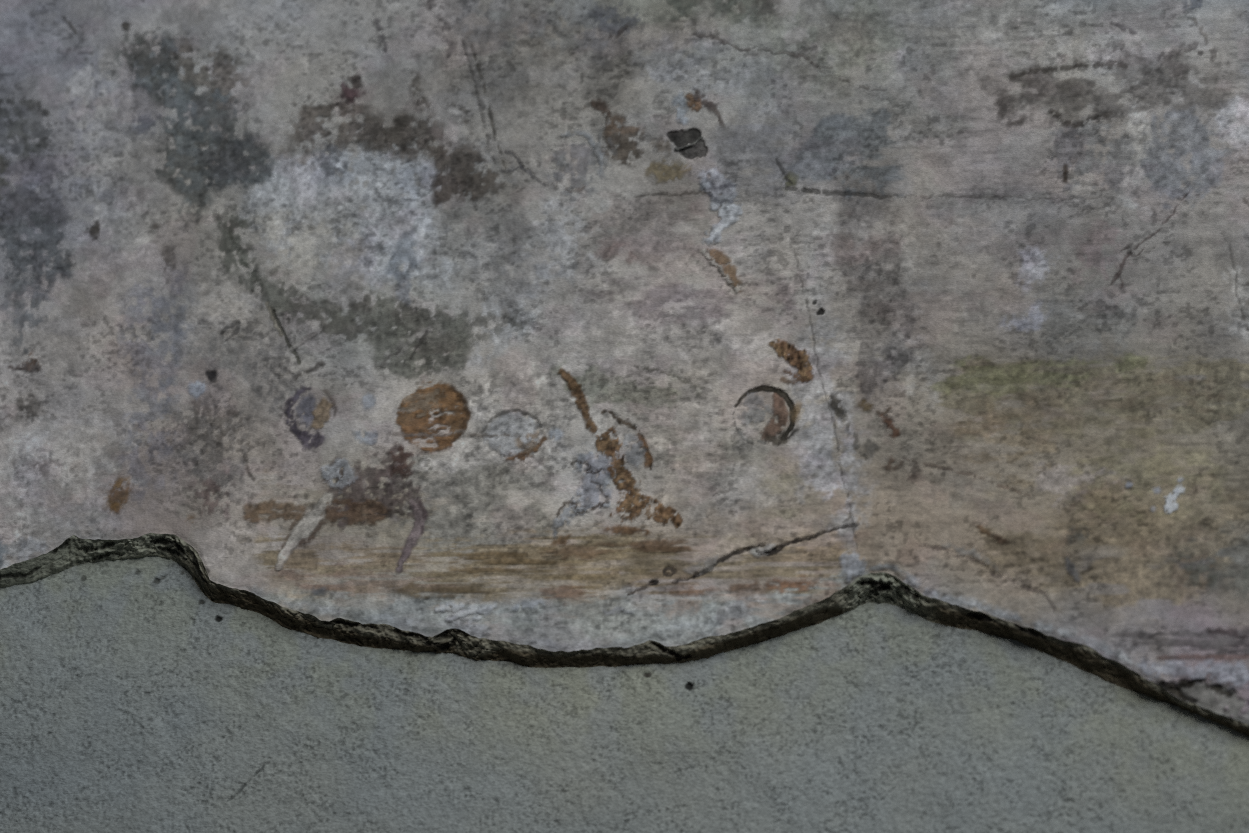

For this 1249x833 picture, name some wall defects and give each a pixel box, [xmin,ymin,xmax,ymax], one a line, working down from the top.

spalling [0,533,1249,737]
crack [675,525,857,583]